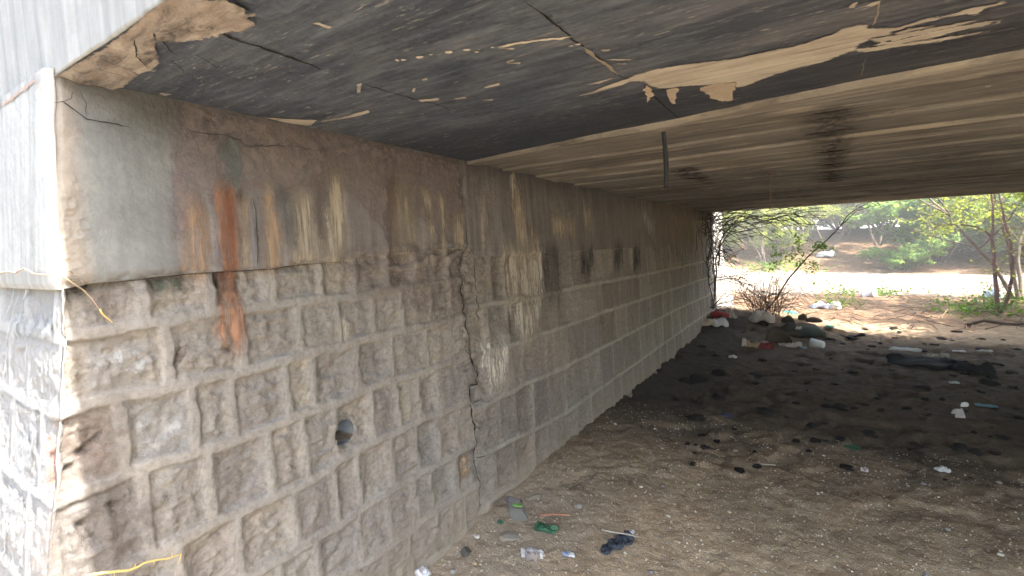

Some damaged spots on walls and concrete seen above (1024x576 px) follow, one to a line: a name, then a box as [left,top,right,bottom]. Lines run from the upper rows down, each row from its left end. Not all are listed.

spalling [55,0,256,90]
crack [222,33,321,70]
crack [526,2,627,79]
peeling [580,1,1007,104]
crack [55,92,129,127]
peeling [262,110,370,126]
leakage [807,109,855,182]
rust [185,183,245,348]
crack [459,198,485,514]